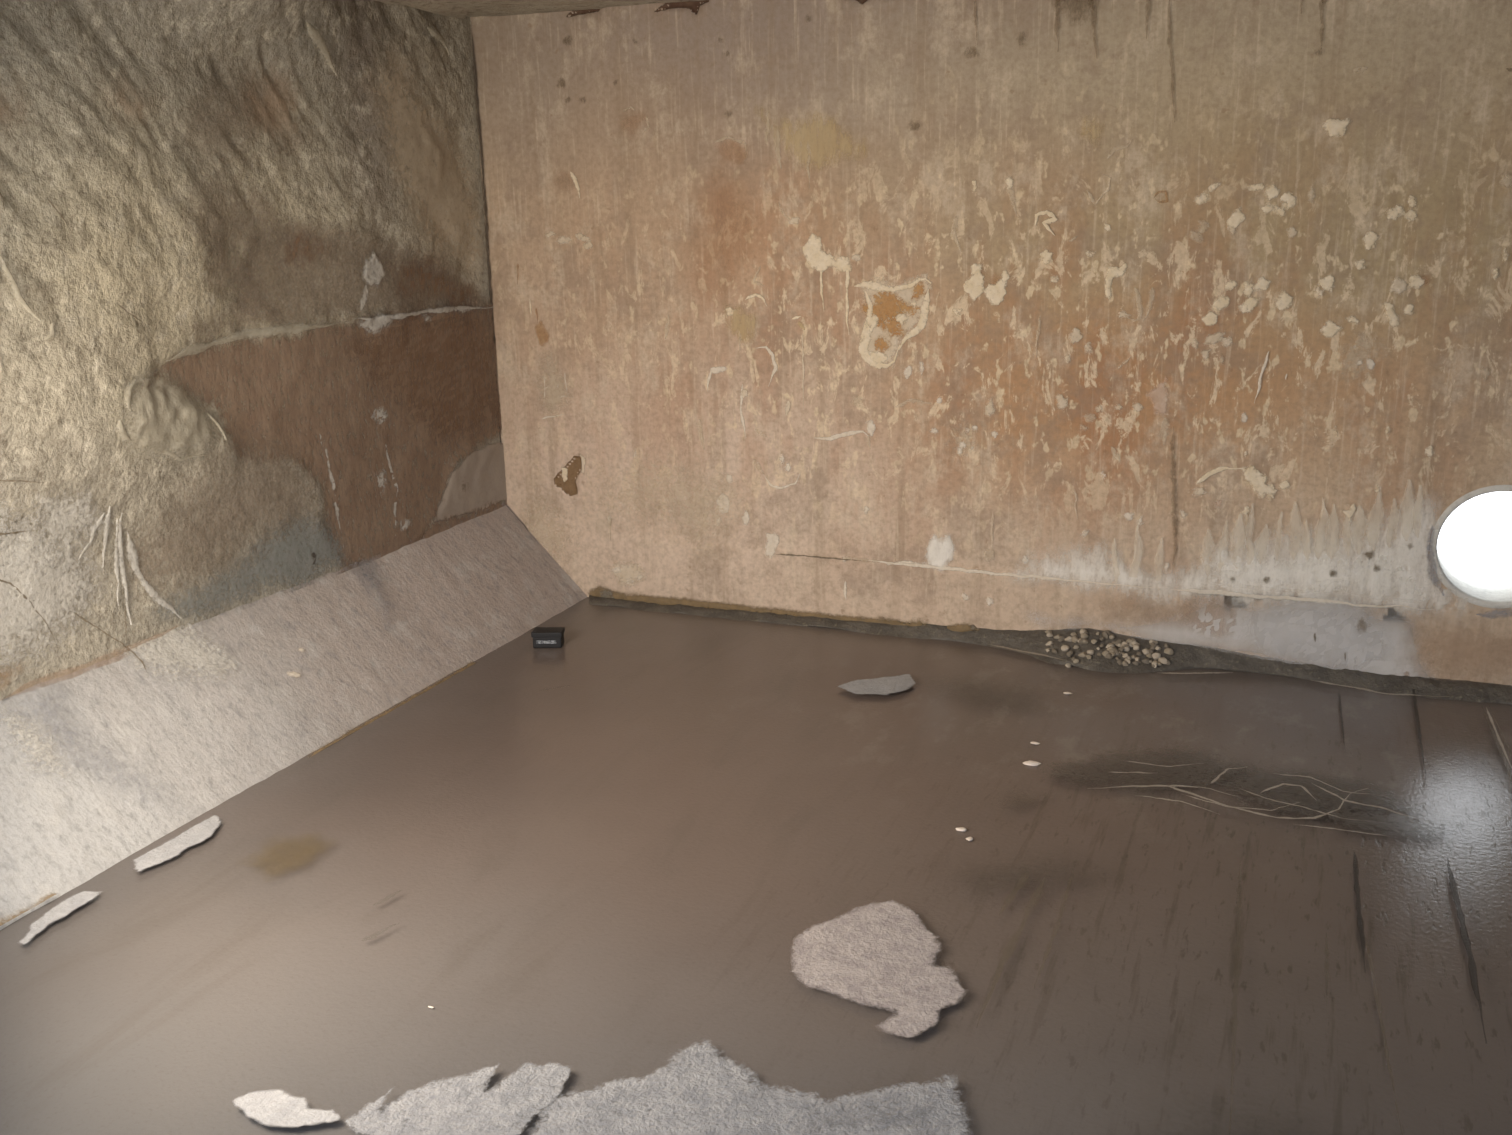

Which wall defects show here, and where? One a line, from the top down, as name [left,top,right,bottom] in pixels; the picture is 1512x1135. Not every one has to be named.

peeling [725,293,777,384]
peeling [789,218,931,369]
peeling [140,304,507,568]
water stain [1030,502,1463,677]